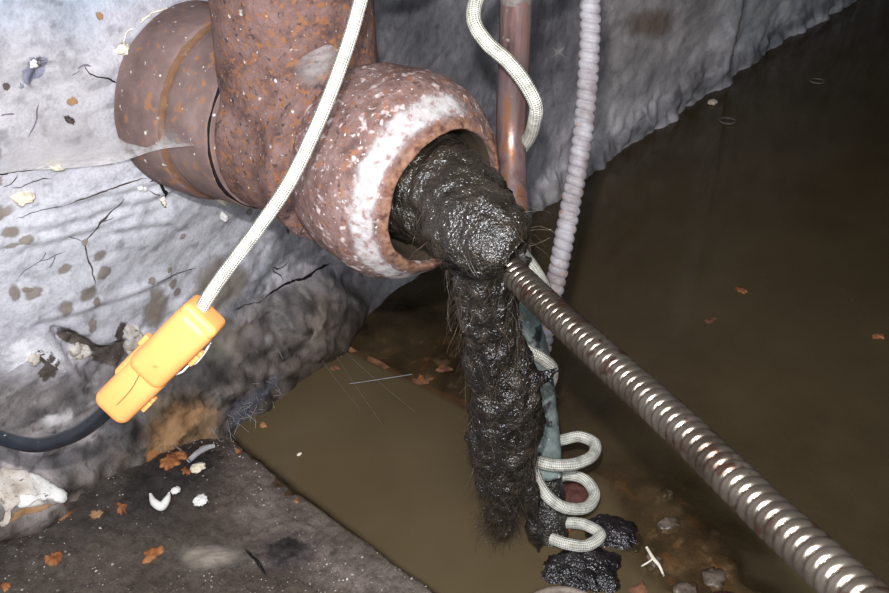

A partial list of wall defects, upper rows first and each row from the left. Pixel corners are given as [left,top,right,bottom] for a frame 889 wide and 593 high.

crack [71,64,116,83]
crack [0,170,48,188]
damp [0,207,33,249]
crack [18,178,168,285]
damp [9,286,42,300]
damp [59,302,72,315]
damp [81,251,110,307]
damp [145,268,180,324]
crack [234,262,331,312]
flaking render [56,322,144,365]
flaking render [27,350,60,382]